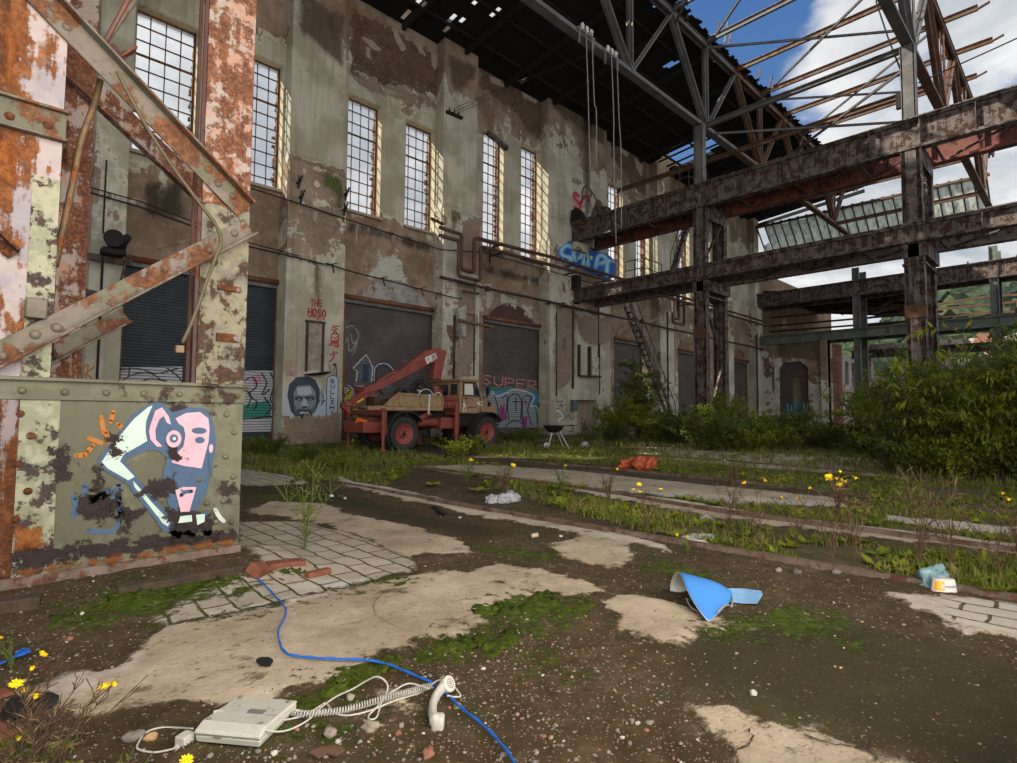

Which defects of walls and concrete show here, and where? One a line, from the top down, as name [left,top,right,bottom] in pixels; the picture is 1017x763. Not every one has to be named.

rust [0,0,11,92]
flaking render [348,10,438,110]
rust [0,127,19,190]
flaking render [297,199,343,255]
peeling [10,432,243,573]
crack [732,728,755,763]
crack [804,733,883,763]